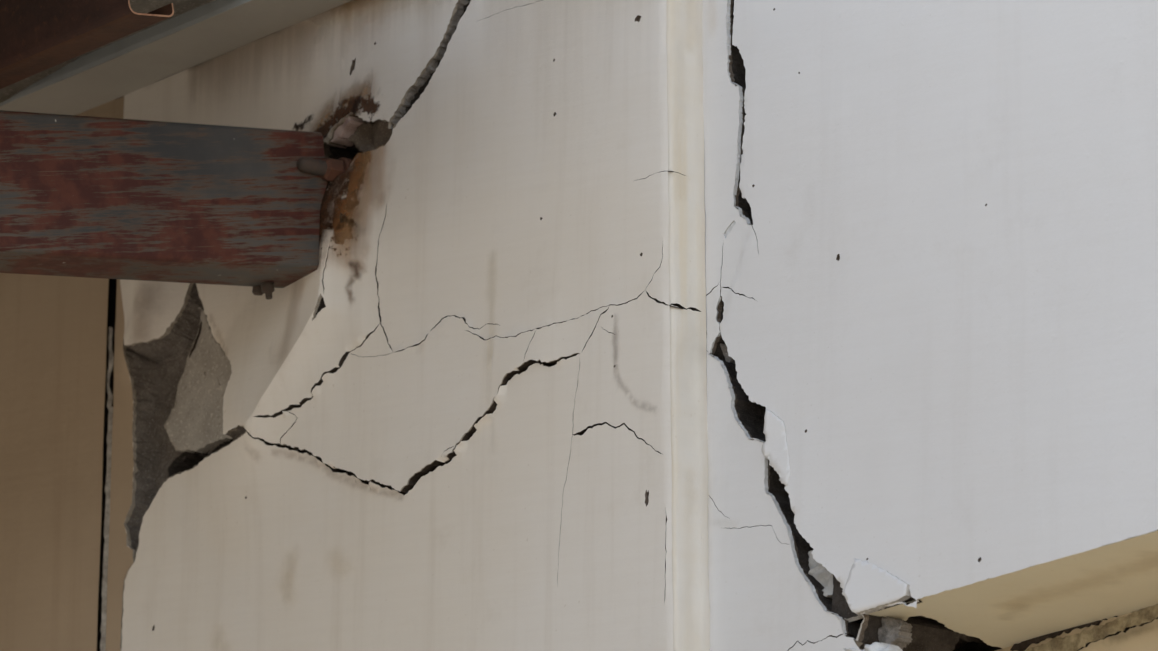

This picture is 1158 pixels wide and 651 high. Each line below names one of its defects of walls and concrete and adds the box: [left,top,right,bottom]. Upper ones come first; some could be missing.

corrosion [293,84,380,139]
flaking render [323,112,397,160]
crack [388,0,542,129]
crack [725,0,759,254]
corrosion [319,150,373,257]
flaking render [123,283,246,563]
crack [168,202,959,651]
spalling [831,575,863,622]
spalling [843,603,913,651]
spalling [952,633,984,651]